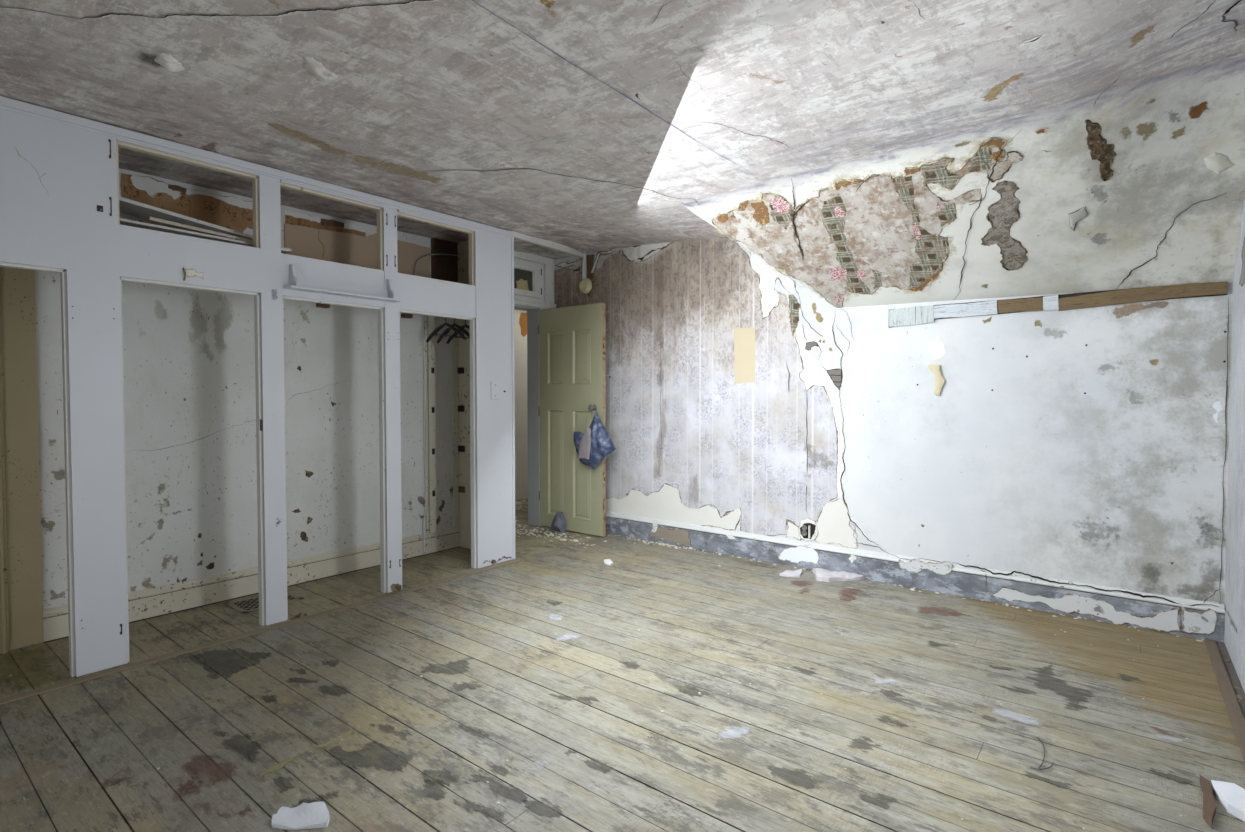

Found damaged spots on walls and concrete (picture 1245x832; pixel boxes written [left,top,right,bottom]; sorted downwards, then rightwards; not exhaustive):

crack [0,0,438,20]
crack [1170,0,1242,39]
crack [958,129,1022,295]
crack [1115,193,1228,290]
peeling [749,249,798,320]
peeling [778,324,858,565]
crack [796,290,1229,629]
peeling [606,483,742,547]
peeling [899,544,953,575]
peeling [991,586,1218,635]